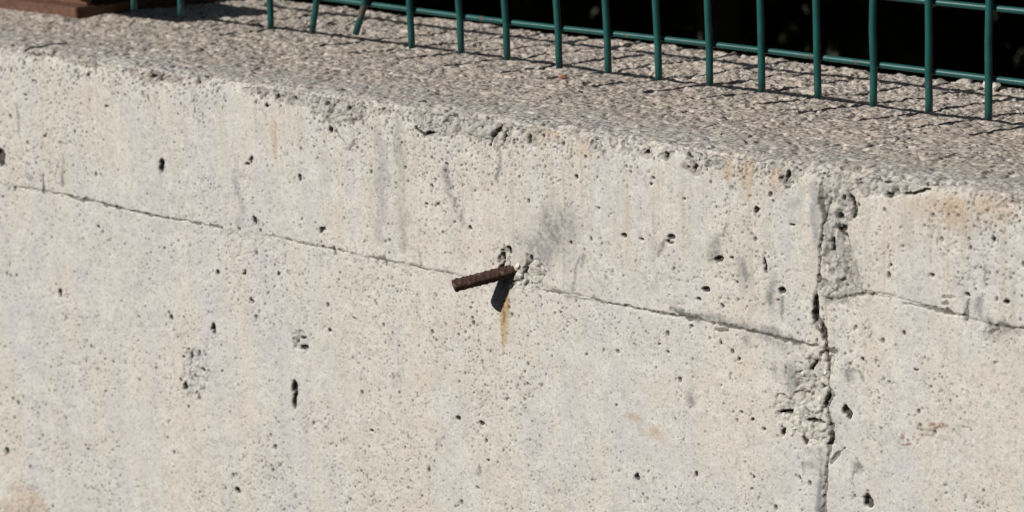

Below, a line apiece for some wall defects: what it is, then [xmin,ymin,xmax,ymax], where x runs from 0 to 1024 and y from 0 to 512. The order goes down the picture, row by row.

crack [22,177,223,228]
crack [272,235,454,274]
spalling [451,246,547,292]
spalling [818,171,955,304]
crack [538,179,1024,512]
spalling [773,350,836,444]